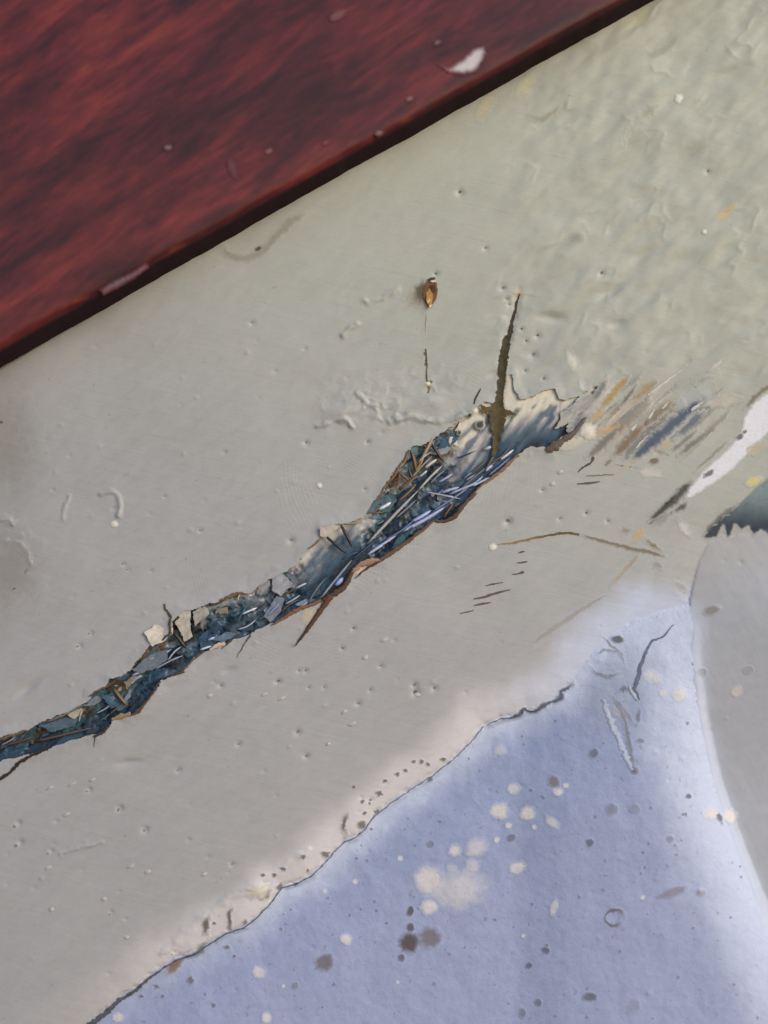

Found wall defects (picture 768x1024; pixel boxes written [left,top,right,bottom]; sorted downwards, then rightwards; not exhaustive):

corrosion [401,276,438,336]
corrosion [423,349,433,393]
peeling [0,374,598,780]
peeling [587,647,638,771]
crack [600,624,674,727]